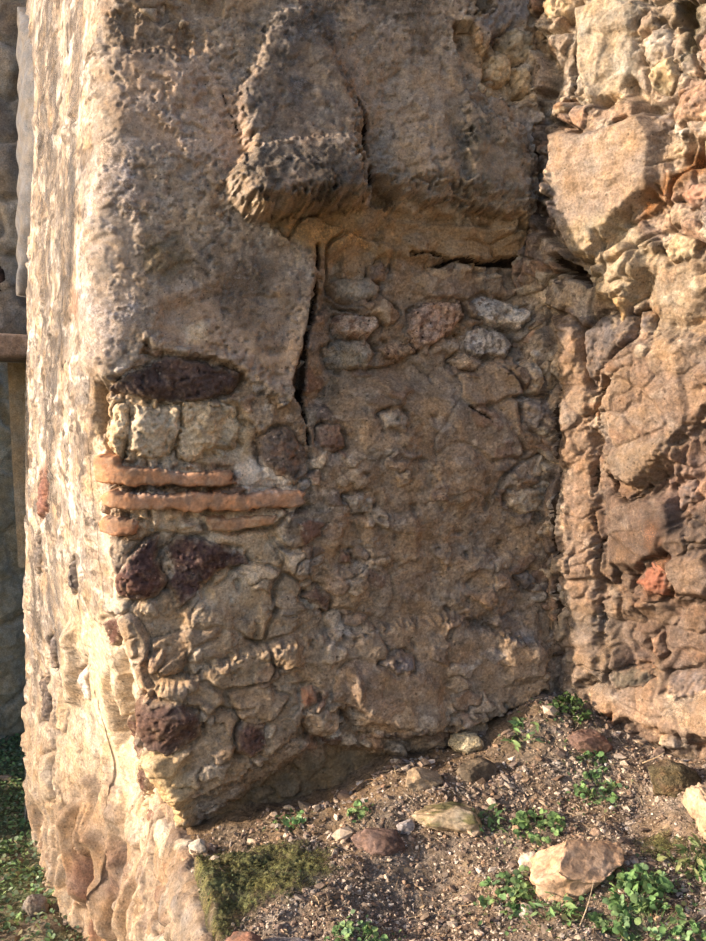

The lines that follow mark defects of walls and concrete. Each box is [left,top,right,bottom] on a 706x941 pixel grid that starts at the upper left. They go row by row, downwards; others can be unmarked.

crack [292,244,319,445]
crack [414,252,518,269]
crack [555,254,594,287]
crack [549,390,565,624]